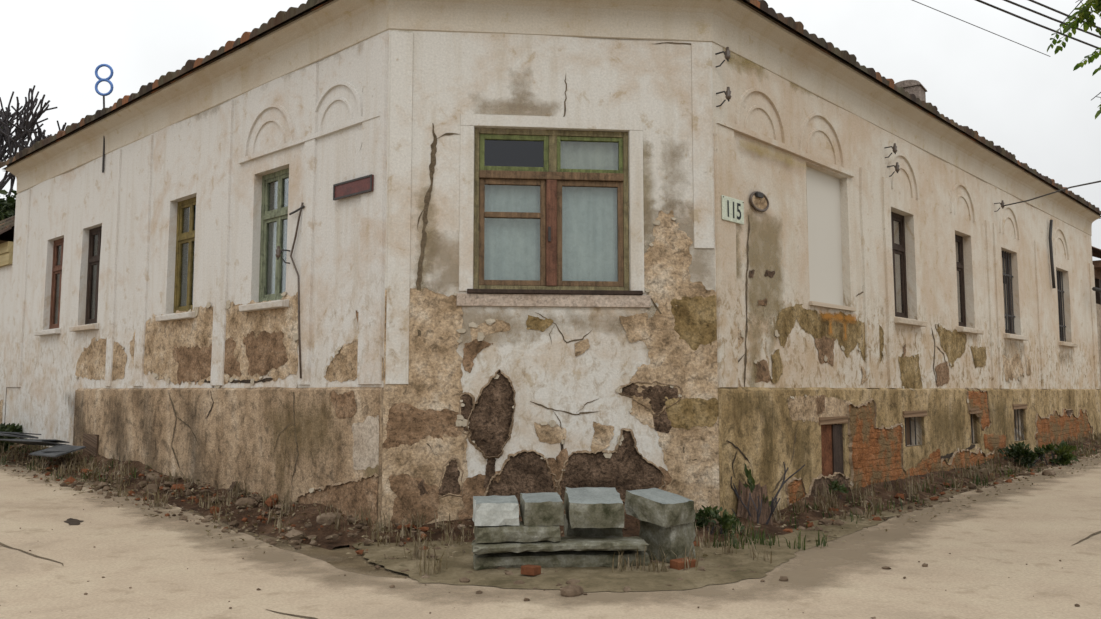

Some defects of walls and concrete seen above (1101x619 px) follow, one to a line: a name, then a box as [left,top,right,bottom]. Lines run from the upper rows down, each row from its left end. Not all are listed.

crack [561,76,569,117]
crack [416,123,457,291]
peeling [75,292,298,389]
peeling [295,210,720,530]
crack [535,312,592,344]
peeling [754,304,867,385]
peeling [935,323,987,386]
crack [530,399,599,450]
flaking render [785,387,1011,506]
flaking render [1035,408,1093,448]